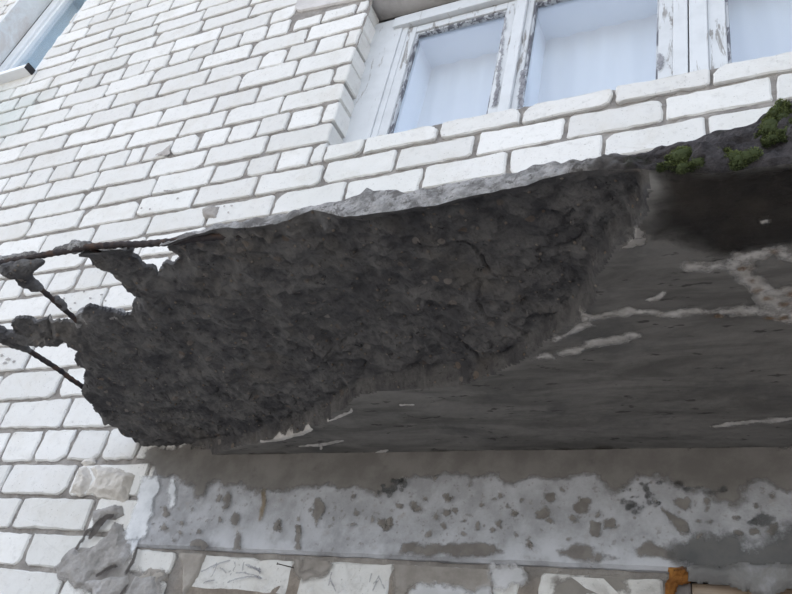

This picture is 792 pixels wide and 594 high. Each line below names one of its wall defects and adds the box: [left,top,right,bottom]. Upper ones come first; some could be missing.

peeling [491,17,506,107]
peeling [517,69,527,108]
spalling [0,169,651,455]
efflorescence [537,333,641,359]
efflorescence [712,417,792,428]
peeling [53,458,157,594]
leakage [125,440,792,552]
leakage [671,514,792,568]